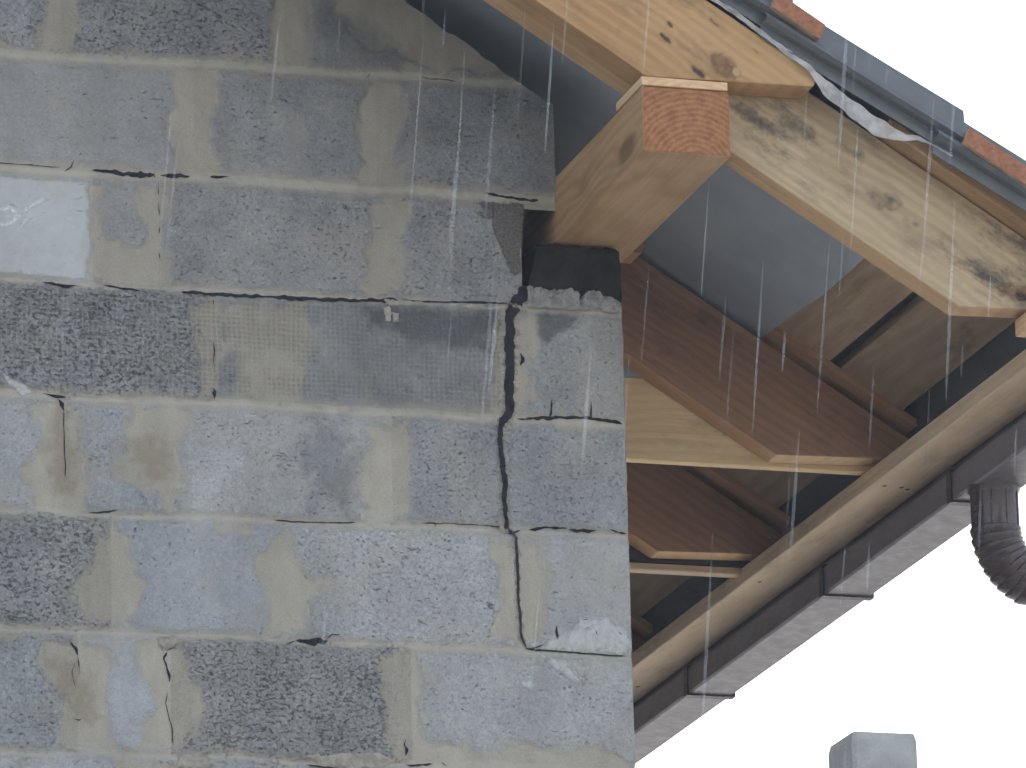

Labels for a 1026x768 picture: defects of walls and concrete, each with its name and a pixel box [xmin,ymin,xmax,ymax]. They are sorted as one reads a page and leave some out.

crack [0,161,74,171]
spalling [527,285,621,313]
crack [43,393,66,475]
crack [495,285,624,657]
crack [163,647,174,742]